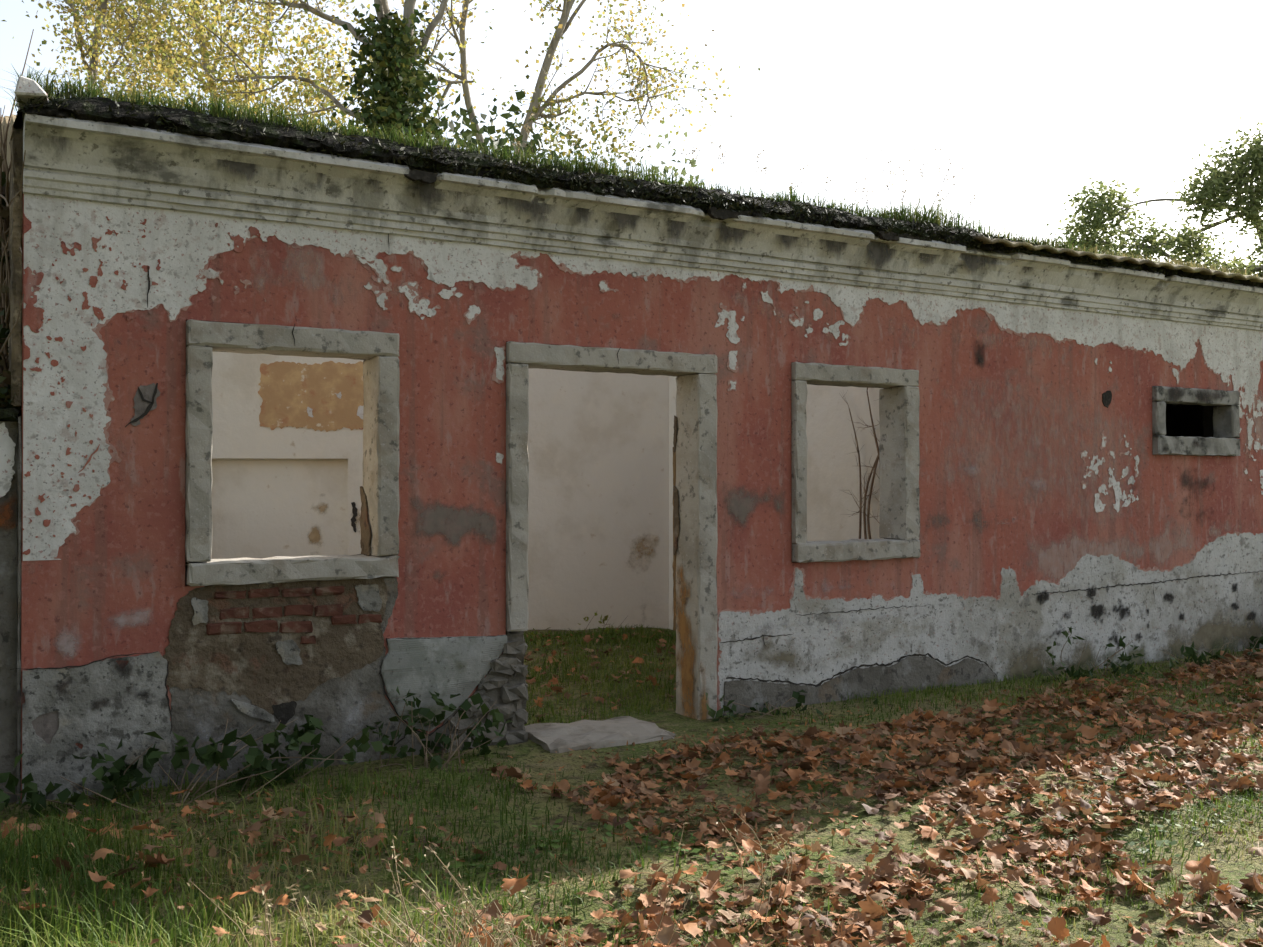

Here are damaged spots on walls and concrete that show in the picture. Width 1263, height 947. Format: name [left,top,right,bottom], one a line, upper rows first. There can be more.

peeling [0,194,1263,561]
flaking render [22,577,528,804]
peeling [717,531,1263,716]